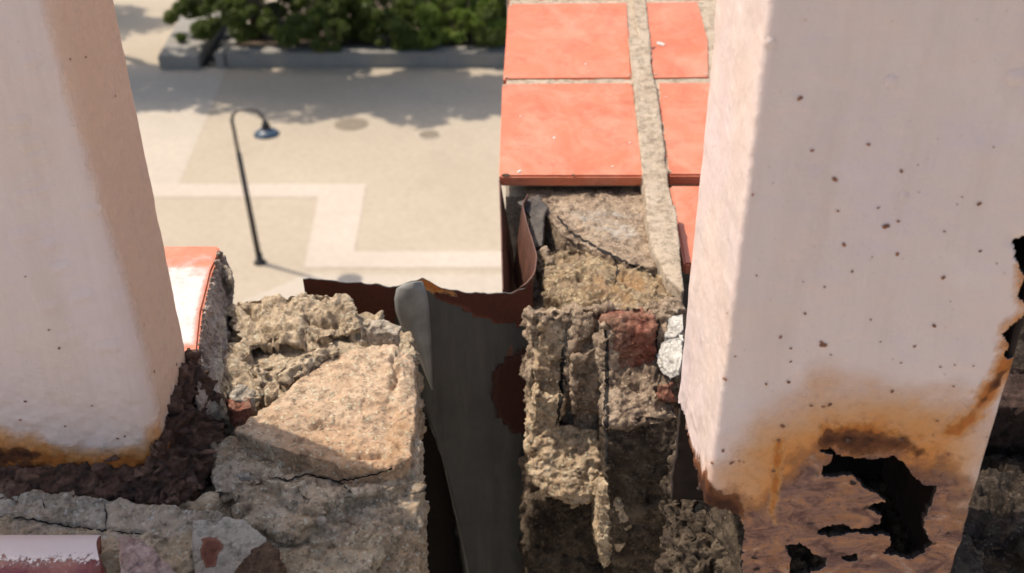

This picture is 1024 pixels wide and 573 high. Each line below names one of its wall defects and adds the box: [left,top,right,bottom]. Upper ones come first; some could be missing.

rust [0,0,186,469]
rust [419,279,533,329]
spalling [1011,320,1024,370]
rust [490,349,527,437]
rust [685,265,1024,573]
spalling [787,543,824,573]
spalling [817,474,917,554]
spalling [950,443,1024,573]